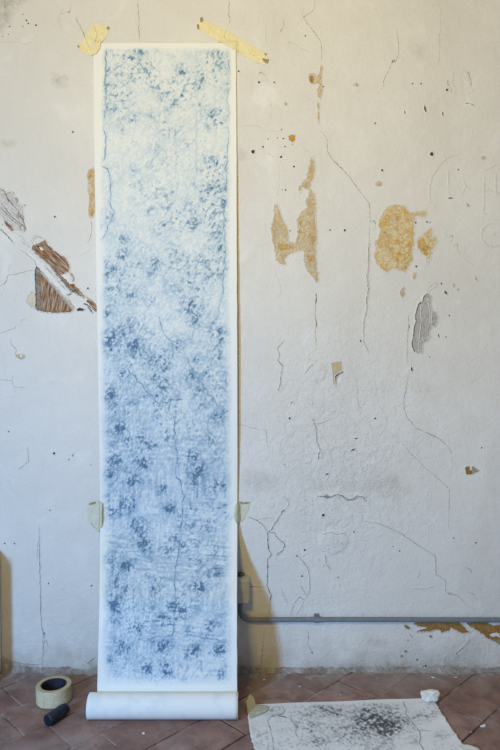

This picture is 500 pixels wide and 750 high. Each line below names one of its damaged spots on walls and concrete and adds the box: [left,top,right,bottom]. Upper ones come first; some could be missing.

peeling [0,187,27,234]
spalling [25,239,97,315]
peeling [86,167,95,219]
peeling [270,156,320,284]
crack [362,228,371,353]
peeling [372,203,438,281]
spalling [410,292,447,358]
peeling [464,465,480,476]
crack [36,523,46,668]
crack [247,492,332,630]
crack [363,520,474,608]
peeling [403,622,500,646]